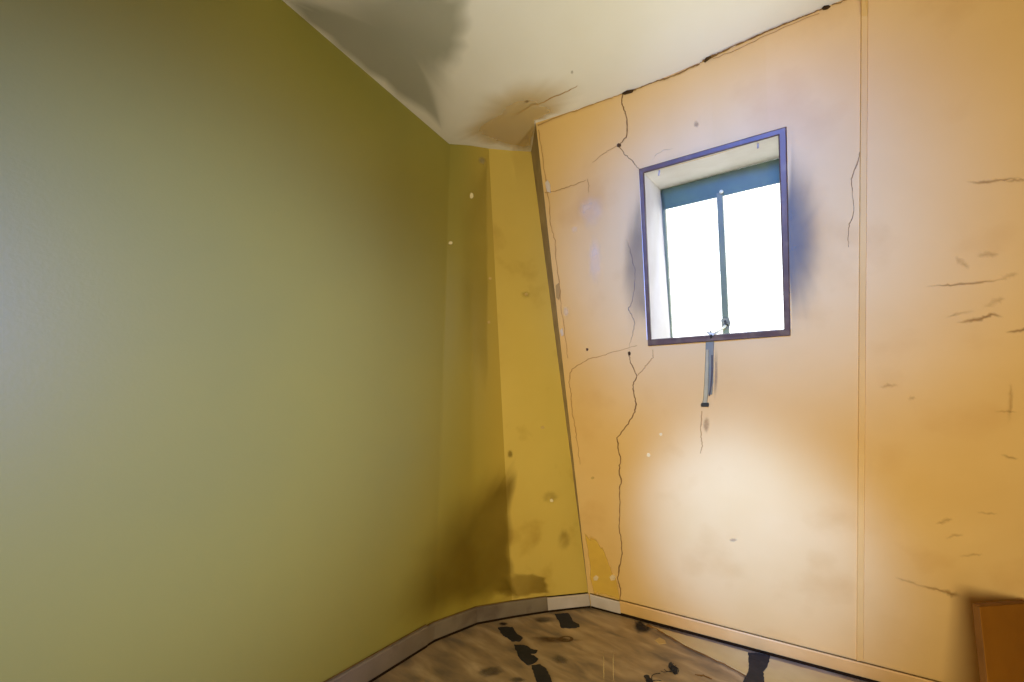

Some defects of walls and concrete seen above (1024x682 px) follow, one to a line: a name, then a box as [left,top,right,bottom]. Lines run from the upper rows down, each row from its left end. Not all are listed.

crack [848,152,860,247]
crack [517,0,845,600]
water stain [440,533,508,590]
peeling [586,536,619,599]